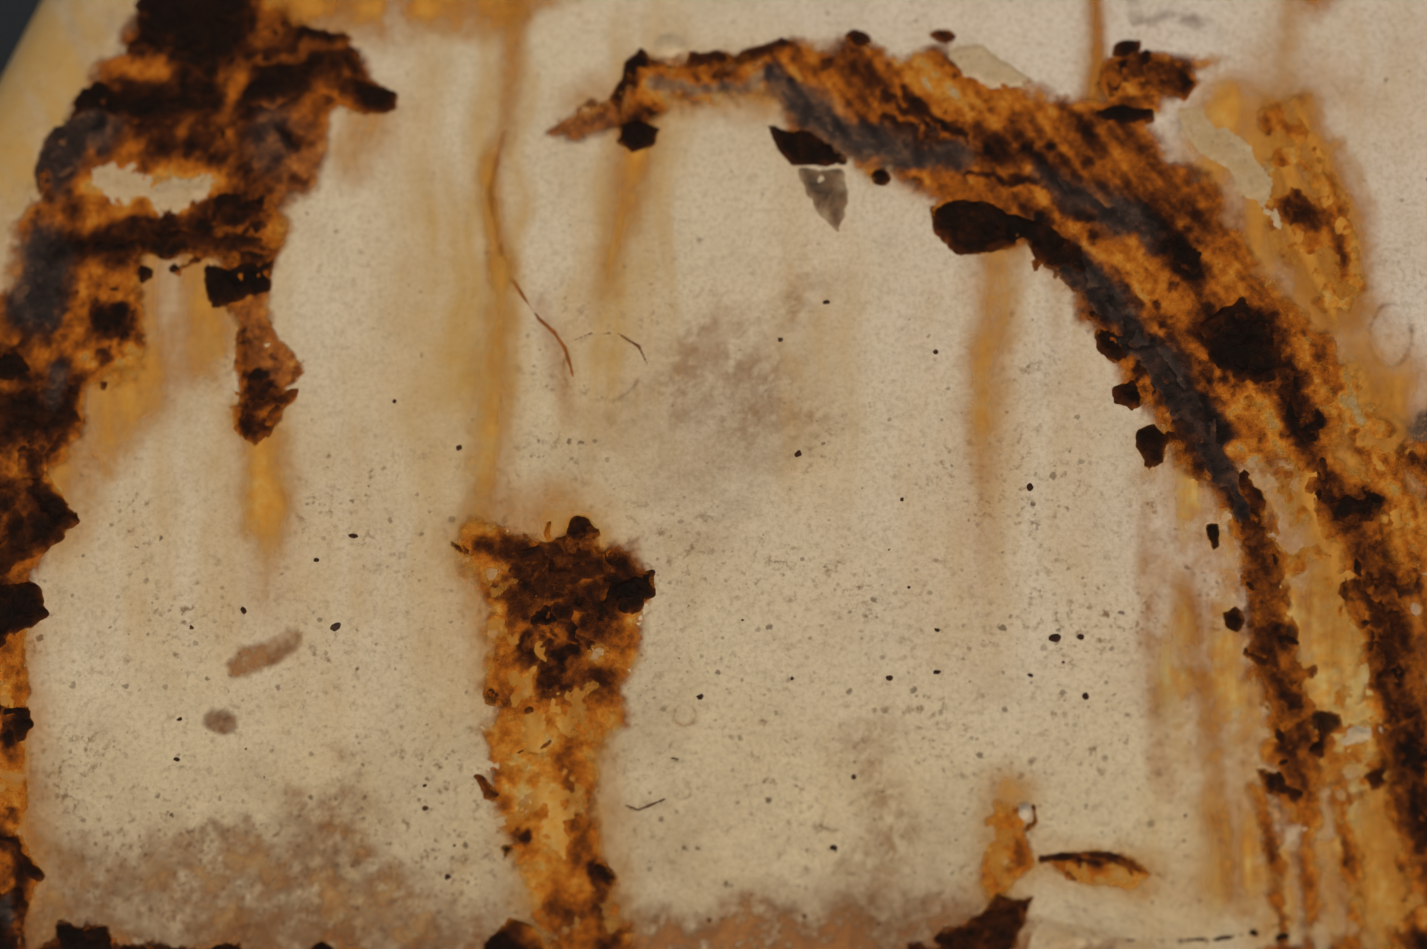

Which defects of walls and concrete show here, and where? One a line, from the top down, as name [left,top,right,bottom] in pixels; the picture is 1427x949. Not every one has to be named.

rust [0,0,552,949]
rust [450,0,1427,949]